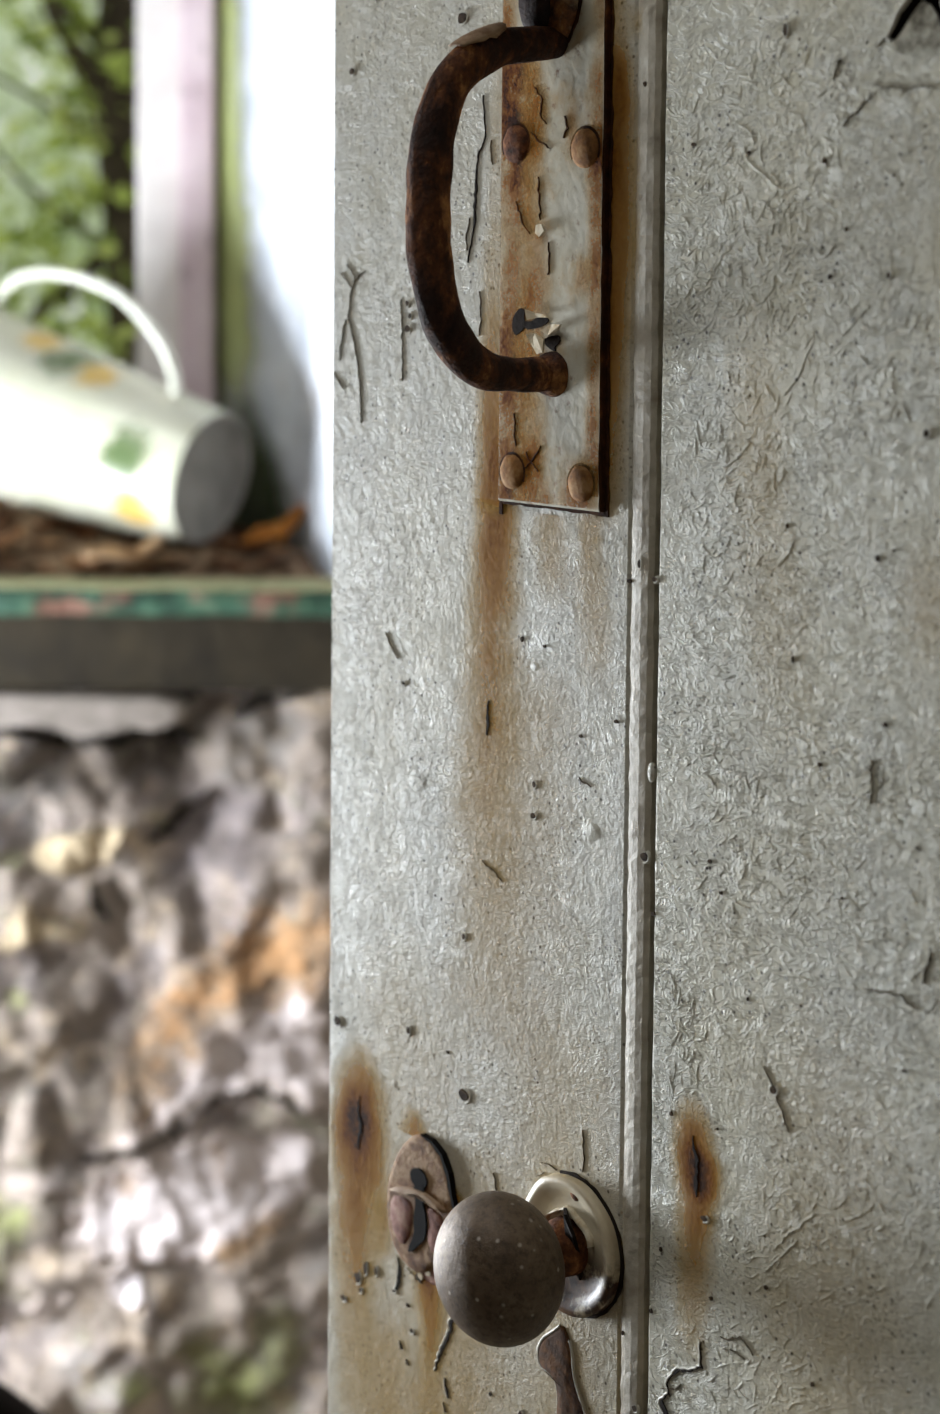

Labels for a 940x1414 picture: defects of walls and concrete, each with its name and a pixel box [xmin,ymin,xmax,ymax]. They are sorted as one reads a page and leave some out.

corrosion [503,0,514,27]
peeling [890,1,940,57]
crack [465,95,493,336]
crack [515,87,569,275]
crack [334,265,365,423]
crack [513,413,541,472]
corrosion [475,40,632,766]
corrosion [332,1060,386,1299]
corrosion [676,1113,718,1282]
corrosion [417,1272,439,1357]
peeling [537,1325,588,1414]
crack [657,1336,753,1414]